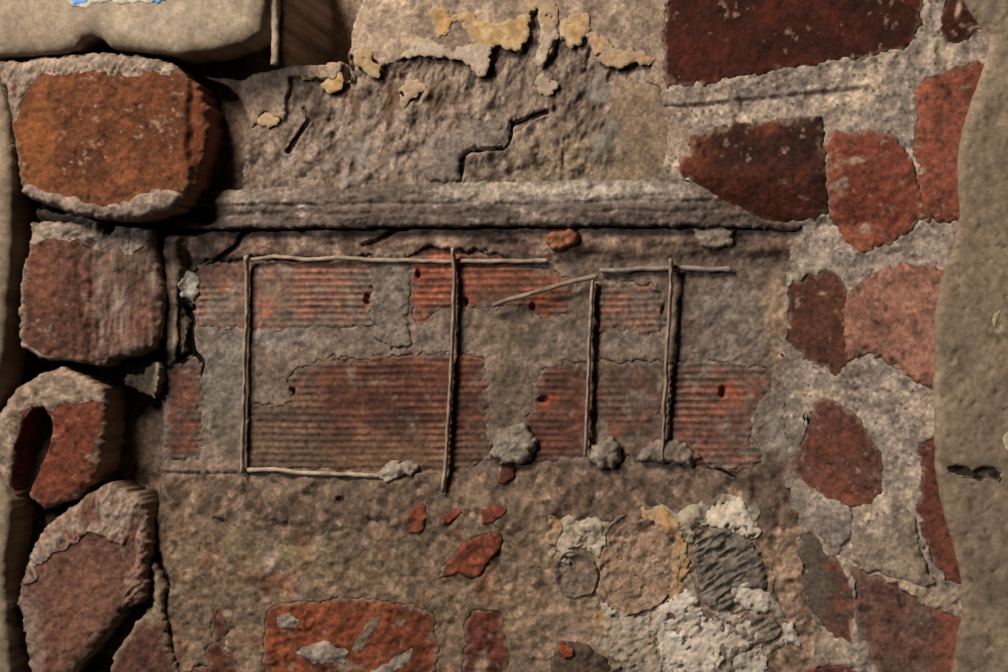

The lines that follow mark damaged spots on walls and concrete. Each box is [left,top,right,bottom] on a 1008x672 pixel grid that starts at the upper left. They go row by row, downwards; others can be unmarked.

flaking render [242,0,669,193]
crack [458,111,547,183]